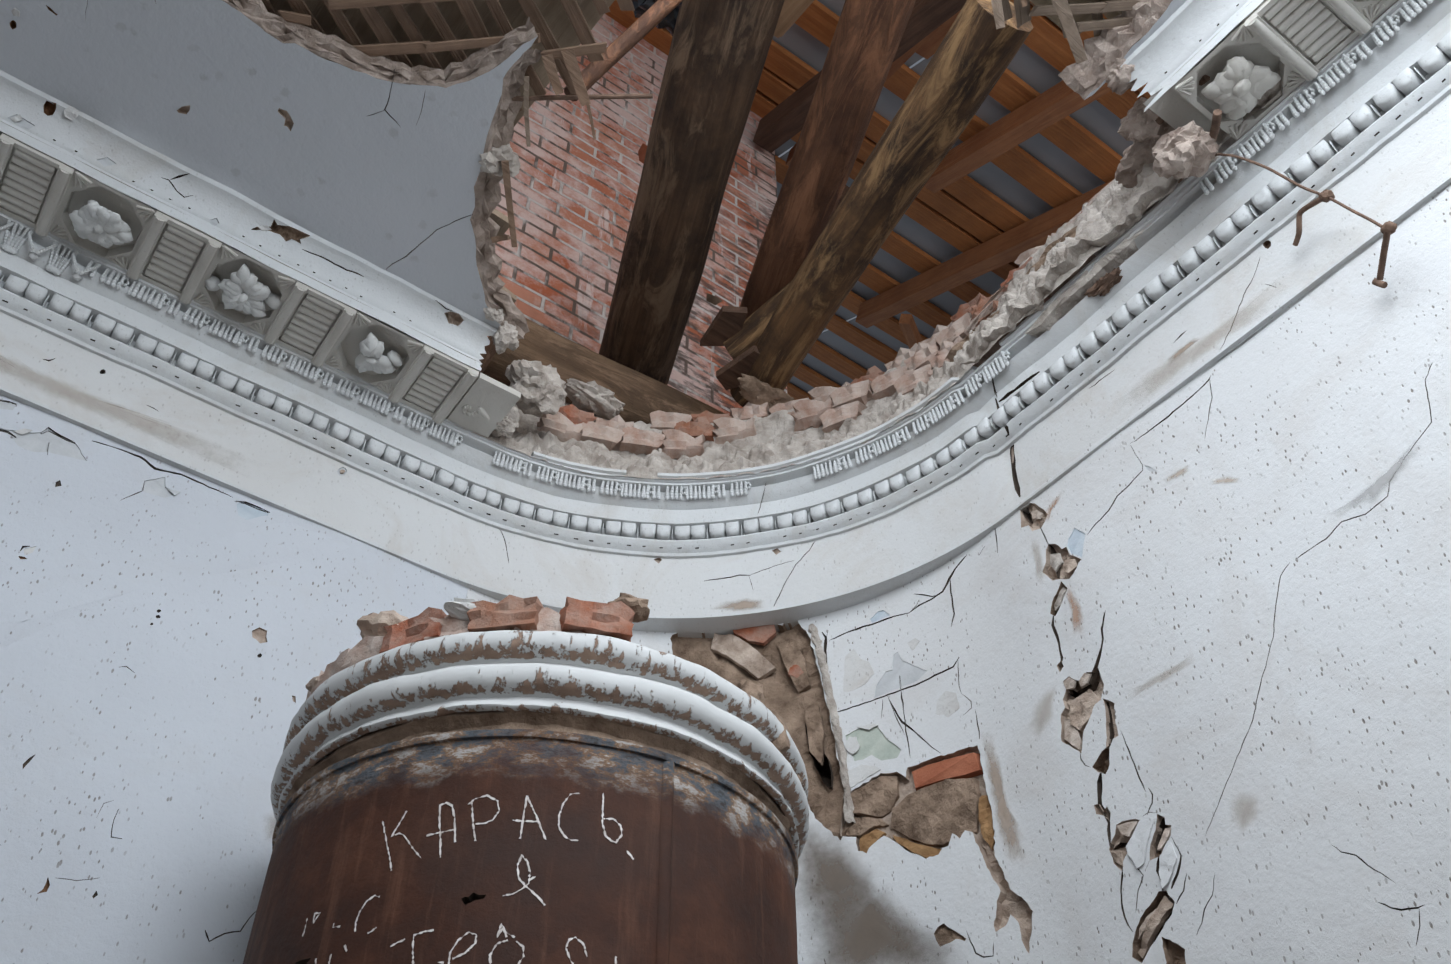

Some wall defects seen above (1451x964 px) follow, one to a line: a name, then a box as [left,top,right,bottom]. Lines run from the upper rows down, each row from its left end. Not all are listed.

flaking render [223,0,542,153]
flaking render [251,220,310,244]
flaking render [435,300,463,326]
flaking render [470,172,529,340]
crack [93,441,233,498]
crack [706,541,815,606]
crack [822,259,1432,964]
spalling [670,623,1033,958]